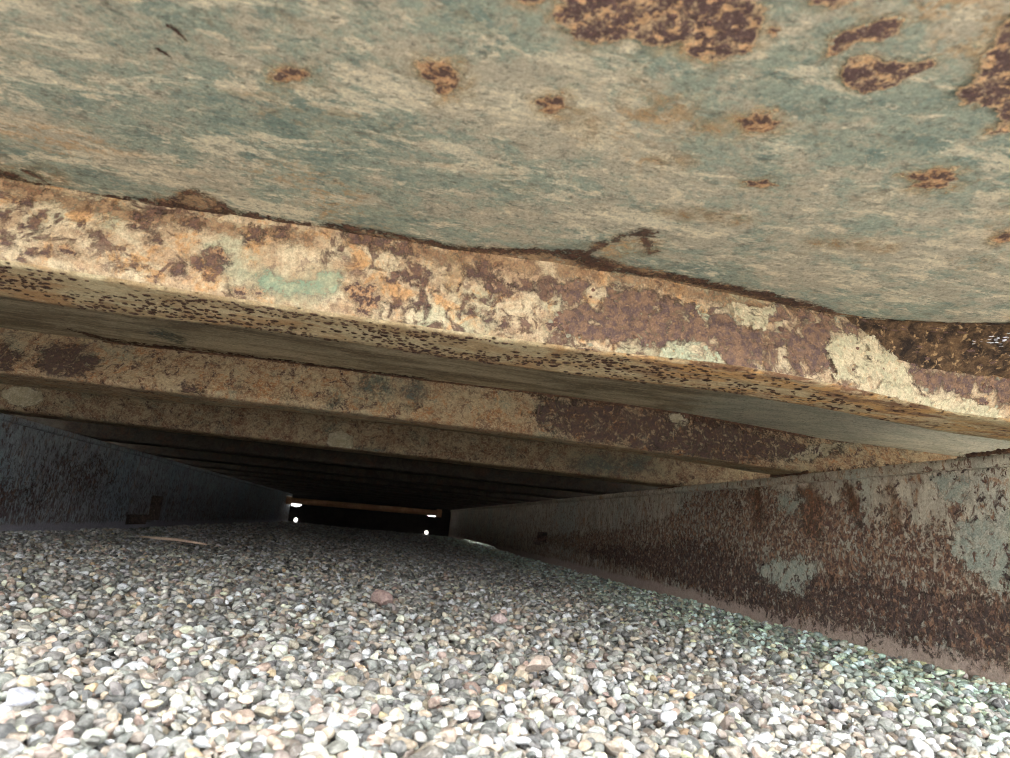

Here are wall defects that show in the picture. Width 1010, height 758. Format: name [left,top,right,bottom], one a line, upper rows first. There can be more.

corrosion [413,57,469,102]
corrosion [535,91,572,118]
corrosion [519,0,782,63]
corrosion [727,108,782,134]
corrosion [823,15,938,95]
corrosion [956,18,1010,136]
corrosion [0,178,318,248]
crack [0,167,839,316]
corrosion [0,232,920,421]
corrosion [904,360,1010,408]
corrosion [521,398,917,472]
corrosion [534,454,1010,674]